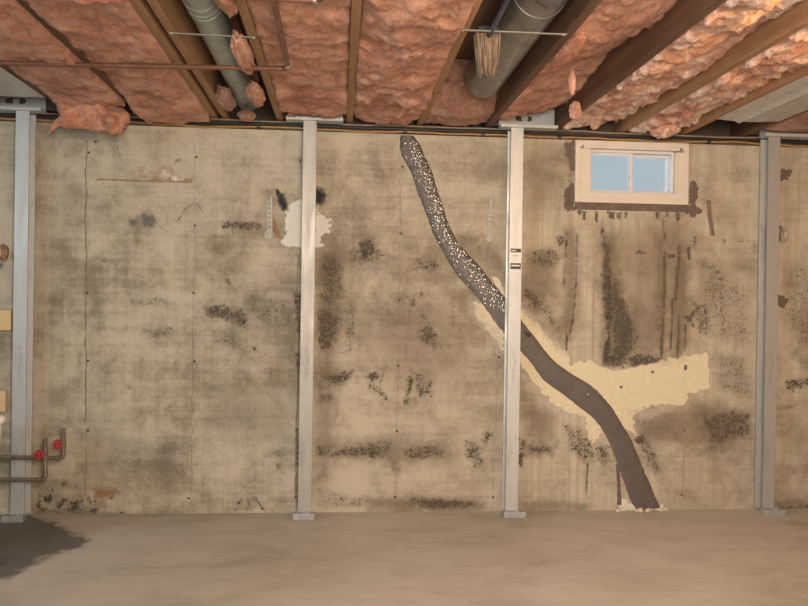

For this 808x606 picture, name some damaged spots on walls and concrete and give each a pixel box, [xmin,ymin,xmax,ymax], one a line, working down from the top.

leakage [315,238,386,353]
leakage [521,233,578,352]
leakage [578,210,697,368]
leakage [419,315,442,349]
crack [390,135,660,512]
spalling [683,304,716,351]
leakage [318,441,391,459]
leakage [405,442,444,460]
leakage [464,428,493,467]
leakage [412,498,478,510]
leakage [0,489,97,578]